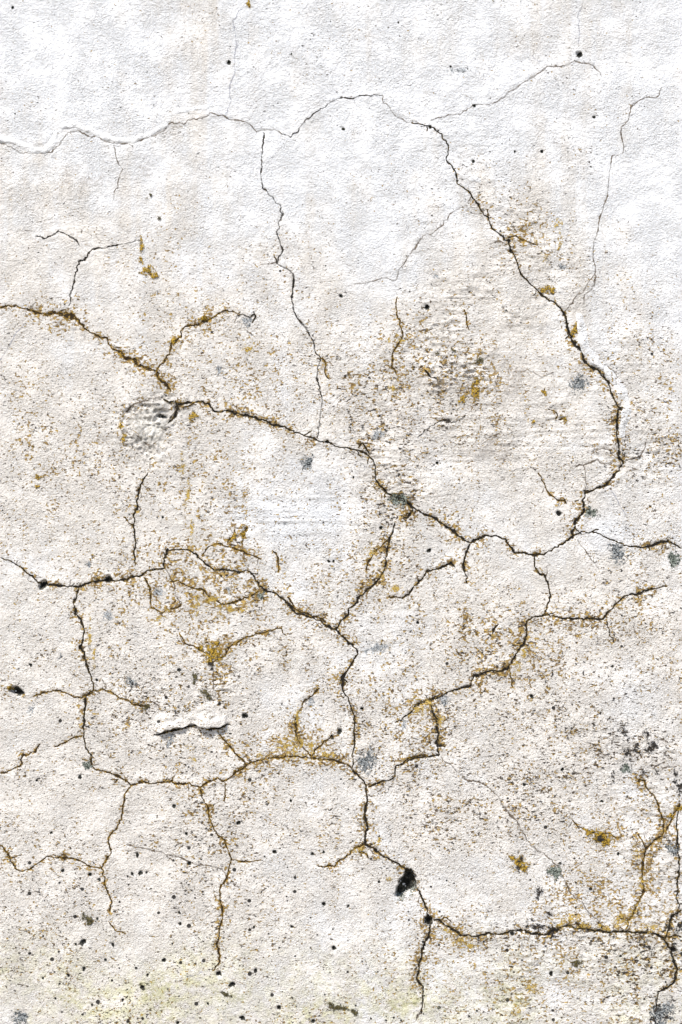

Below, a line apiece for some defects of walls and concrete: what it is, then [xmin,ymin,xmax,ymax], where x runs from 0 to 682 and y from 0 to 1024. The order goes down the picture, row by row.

crack [41,130,144,192]
crack [0,219,241,391]
crack [163,76,329,399]
crack [278,94,388,138]
crack [512,57,601,91]
crack [610,89,661,163]
crack [167,122,681,723]
crack [123,472,148,565]
crack [0,523,445,971]
crack [411,778,682,1020]